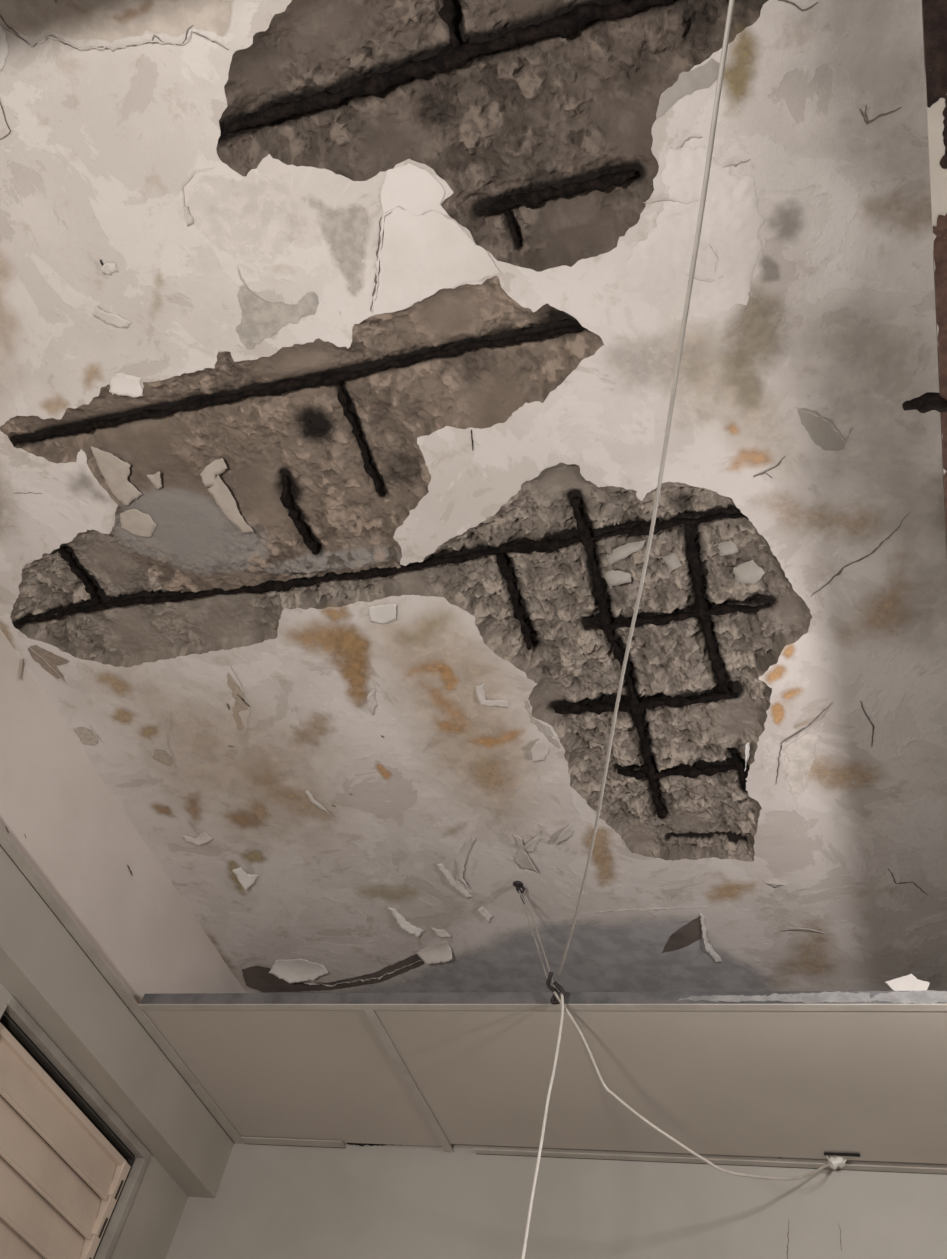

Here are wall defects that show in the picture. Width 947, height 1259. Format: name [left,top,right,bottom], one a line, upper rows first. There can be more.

crack [0,15,229,50]
crack [0,102,11,140]
spalling [0,0,768,326]
rust [922,0,947,169]
peeling [796,407,853,451]
rust [933,214,947,550]
spalling [0,266,812,862]
rust [296,608,367,702]
peeling [232,867,259,891]
peeling [437,864,494,923]
peeling [242,907,947,1004]